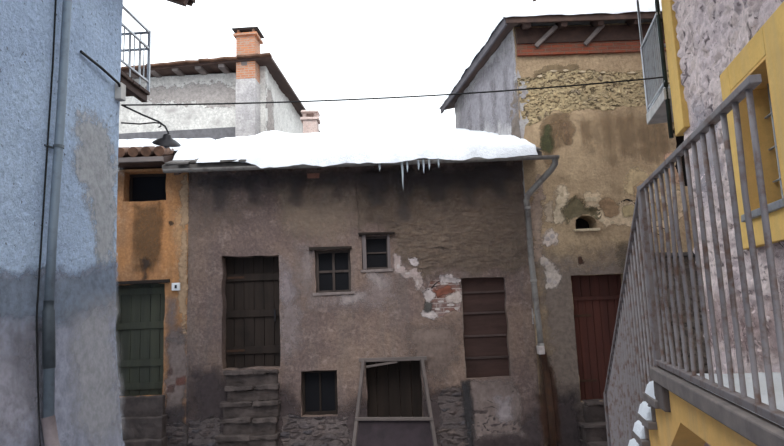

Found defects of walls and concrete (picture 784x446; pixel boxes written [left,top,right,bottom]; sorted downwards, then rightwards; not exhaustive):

leakage [540,113,576,165]
flaking render [510,64,670,139]
flaking render [542,152,683,247]
leakage [0,110,125,446]
leakage [133,203,163,280]
flaking render [393,253,462,320]
flaking render [540,256,562,289]